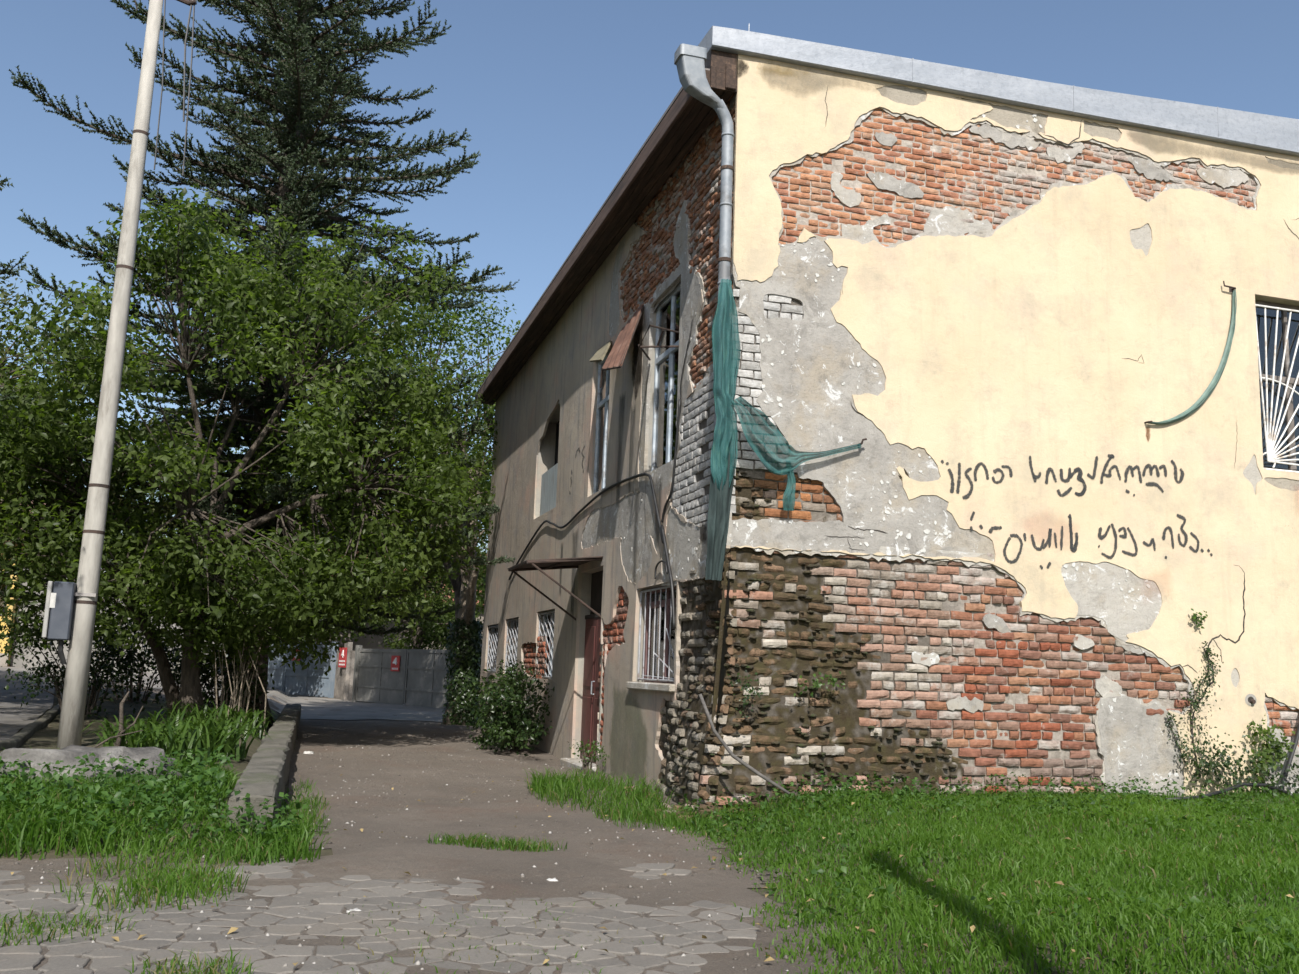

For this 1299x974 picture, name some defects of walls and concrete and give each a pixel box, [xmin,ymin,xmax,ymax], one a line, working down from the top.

spalling [582,85,1261,814]
crack [1182,565,1246,756]
spalling [1231,668,1299,796]